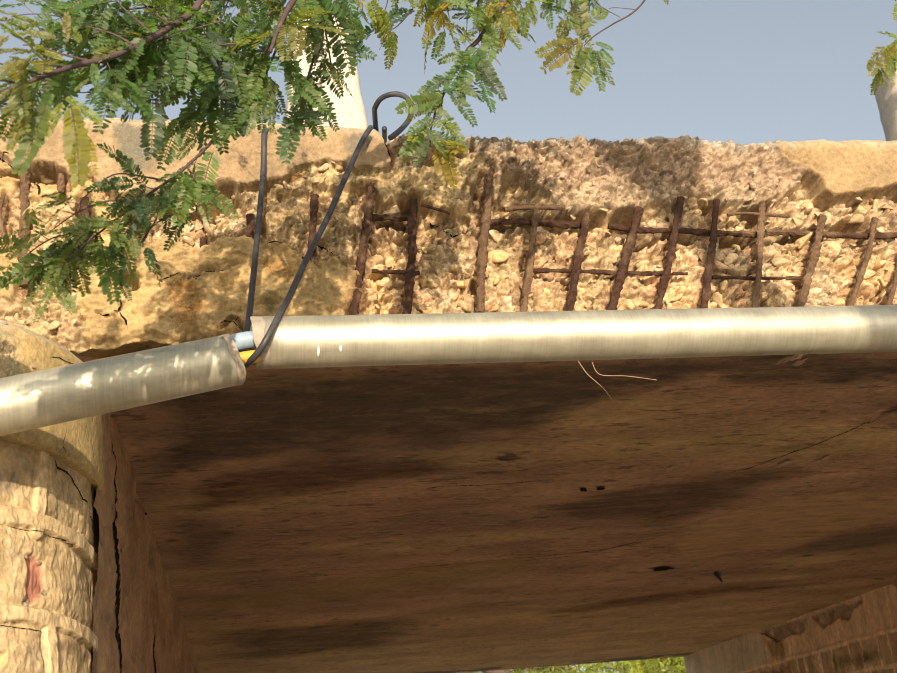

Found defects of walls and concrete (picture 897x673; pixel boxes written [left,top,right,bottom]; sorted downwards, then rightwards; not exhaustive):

spalling [0,133,897,378]
crack [734,416,881,472]
crack [54,428,122,673]
spalling [761,596,863,642]
crack [151,634,159,673]